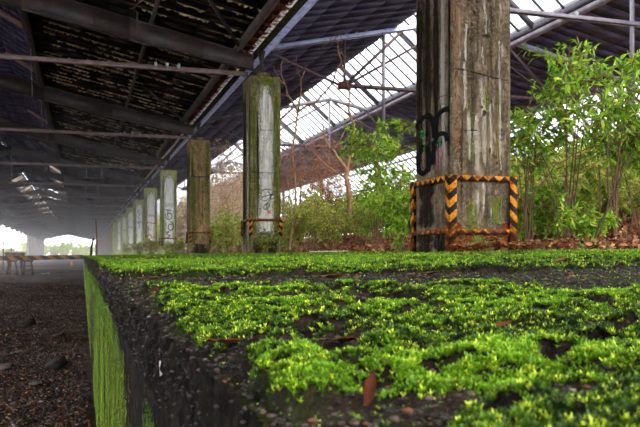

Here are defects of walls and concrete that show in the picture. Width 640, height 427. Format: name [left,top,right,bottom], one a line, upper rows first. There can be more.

water stain [416,0,450,166]
water stain [462,17,500,165]
water stain [187,153,207,254]
water stain [243,97,278,253]
water stain [417,184,445,253]